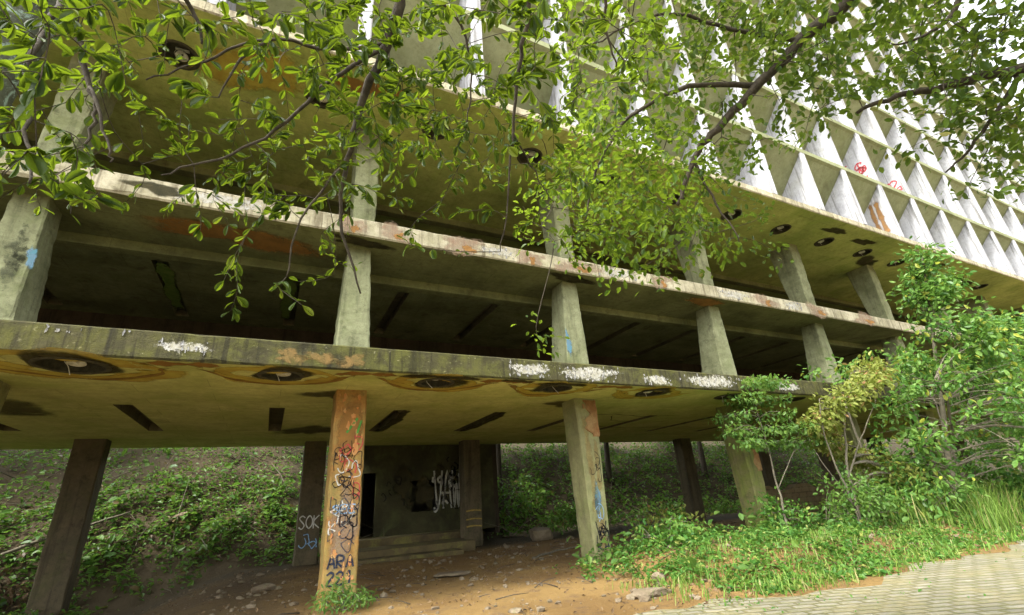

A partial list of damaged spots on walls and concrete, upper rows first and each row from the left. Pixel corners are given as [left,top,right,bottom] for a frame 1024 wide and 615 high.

leakage [0,347,688,407]
spalling [582,400,600,437]